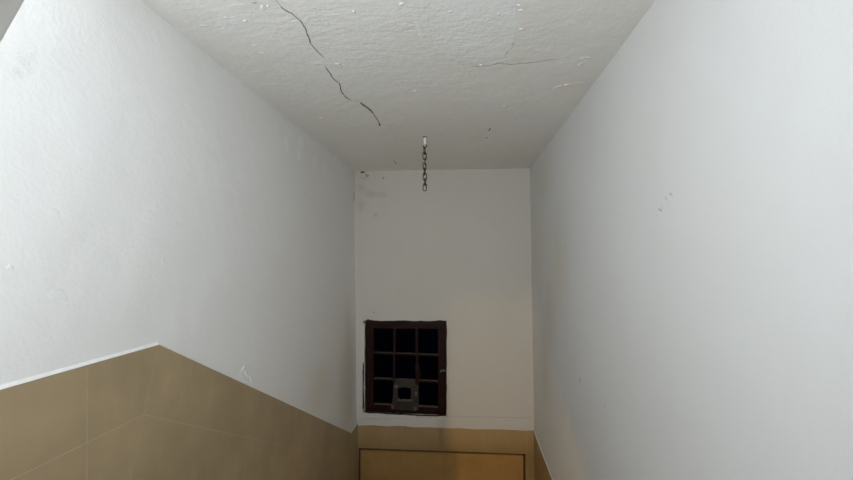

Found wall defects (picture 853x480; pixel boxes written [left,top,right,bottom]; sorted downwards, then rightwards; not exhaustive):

crack [277,2,381,126]